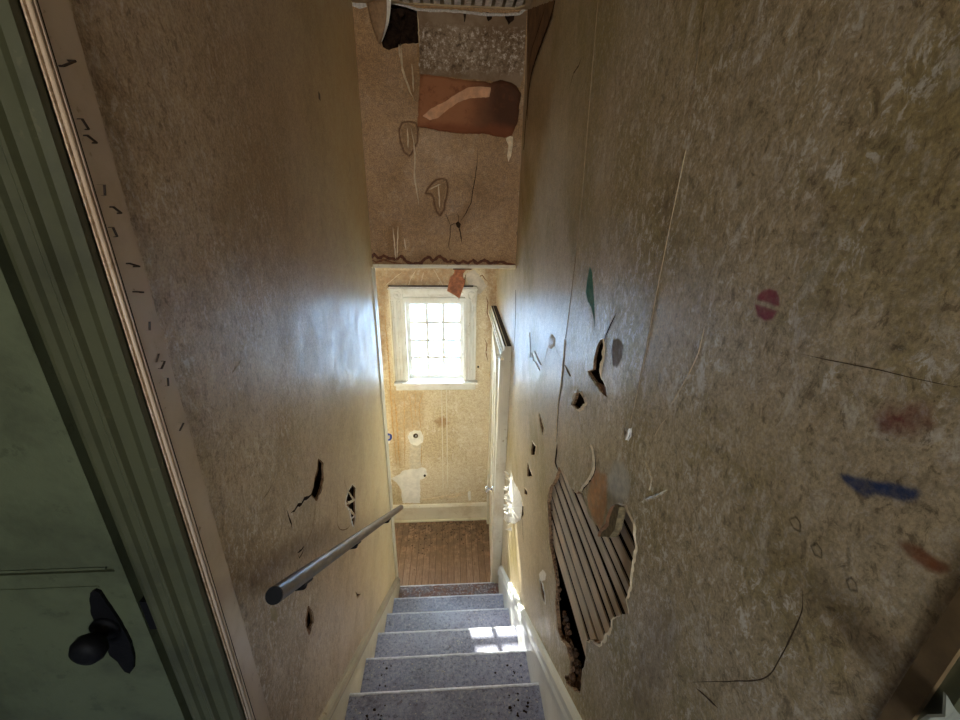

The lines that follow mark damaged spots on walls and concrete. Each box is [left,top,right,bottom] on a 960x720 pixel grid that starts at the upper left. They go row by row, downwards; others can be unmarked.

flaking render [382,4,527,91]
crack [446,152,478,249]
spalling [568,388,587,430]
spalling [587,314,616,396]
crack [807,355,955,387]
spalling [287,459,324,527]
spalling [337,477,356,530]
flaking render [391,430,427,503]
peeling [503,412,545,531]
spalling [539,444,638,693]
spalling [305,606,314,635]
crack [696,592,803,708]